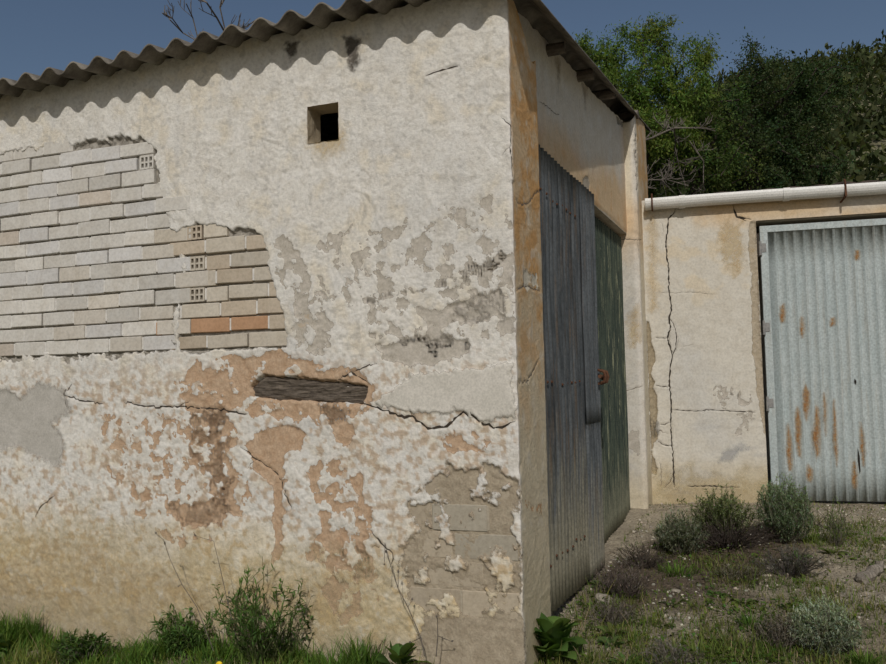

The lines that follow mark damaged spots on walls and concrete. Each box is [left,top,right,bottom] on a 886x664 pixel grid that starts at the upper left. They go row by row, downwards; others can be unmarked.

flaking render [0,135,538,564]
crack [338,363,515,430]
crack [627,211,750,488]
corrosion [786,386,837,470]
corrosion [852,427,864,484]
peeling [305,459,381,625]